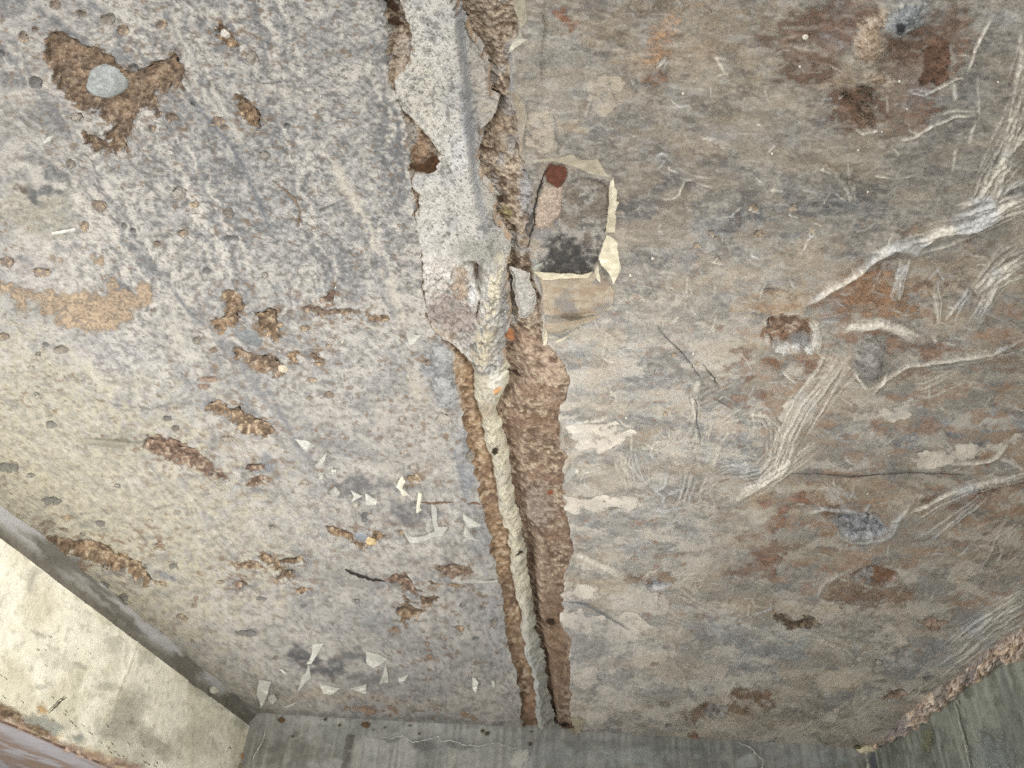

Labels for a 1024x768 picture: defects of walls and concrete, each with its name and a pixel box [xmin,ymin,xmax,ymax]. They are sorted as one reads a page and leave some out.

spalling [18,26,186,156]
rust [755,0,980,145]
spalling [354,0,609,751]
spalling [143,416,230,481]
spalling [204,399,275,443]
spalling [38,515,166,588]
spalling [216,551,308,608]